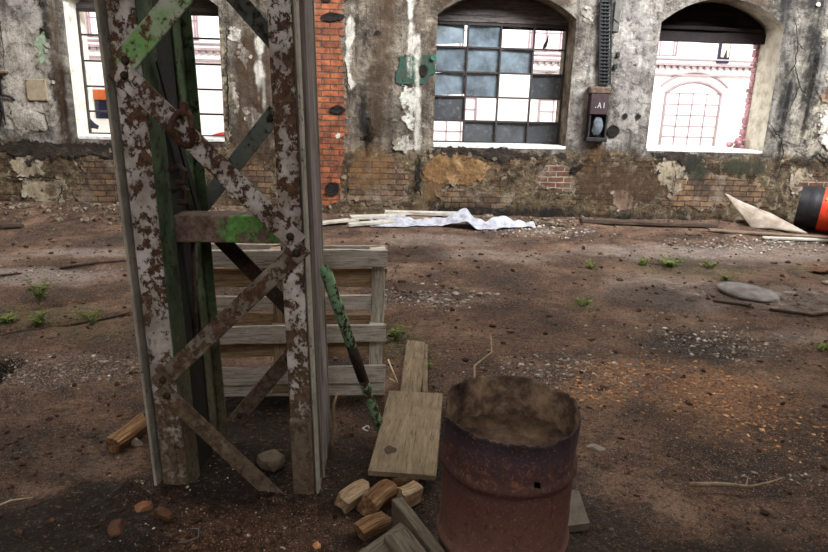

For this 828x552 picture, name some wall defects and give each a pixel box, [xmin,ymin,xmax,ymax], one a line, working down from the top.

flaking render [0,0,114,202]
flaking render [813,41,828,150]
flaking render [422,146,576,214]
flaking render [786,168,828,197]